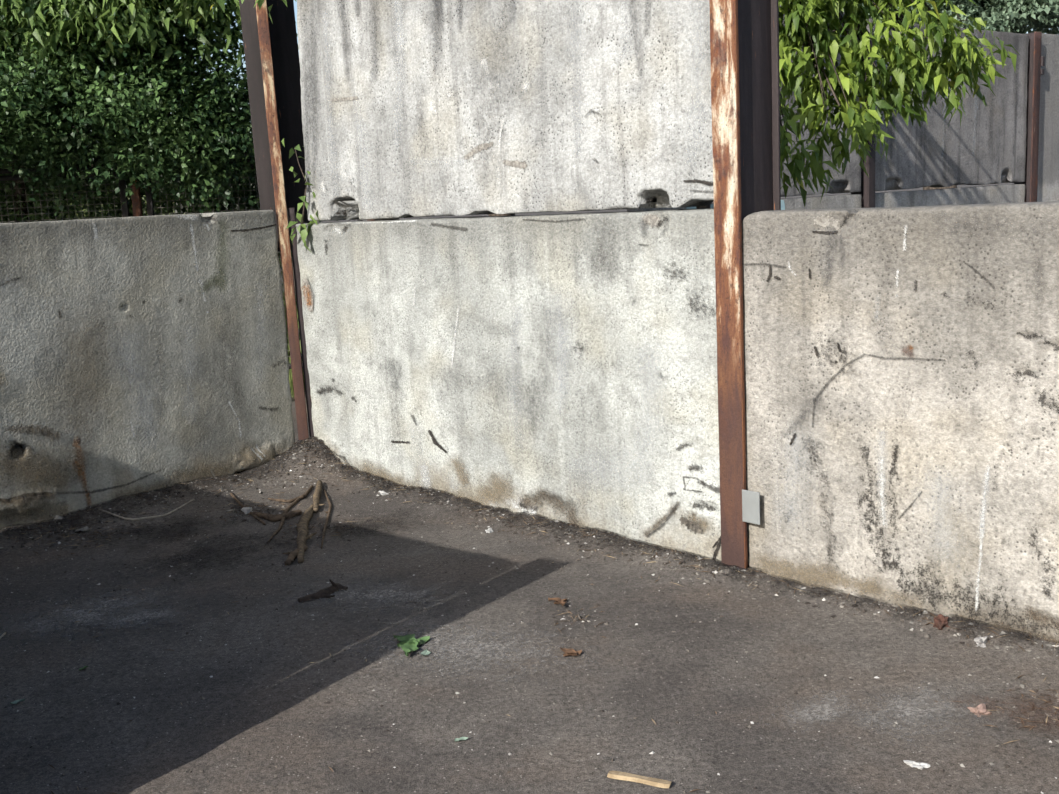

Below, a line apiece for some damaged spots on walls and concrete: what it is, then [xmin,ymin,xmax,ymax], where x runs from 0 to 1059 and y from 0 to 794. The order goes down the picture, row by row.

leakage [804,438,838,572]
leakage [859,440,1059,641]